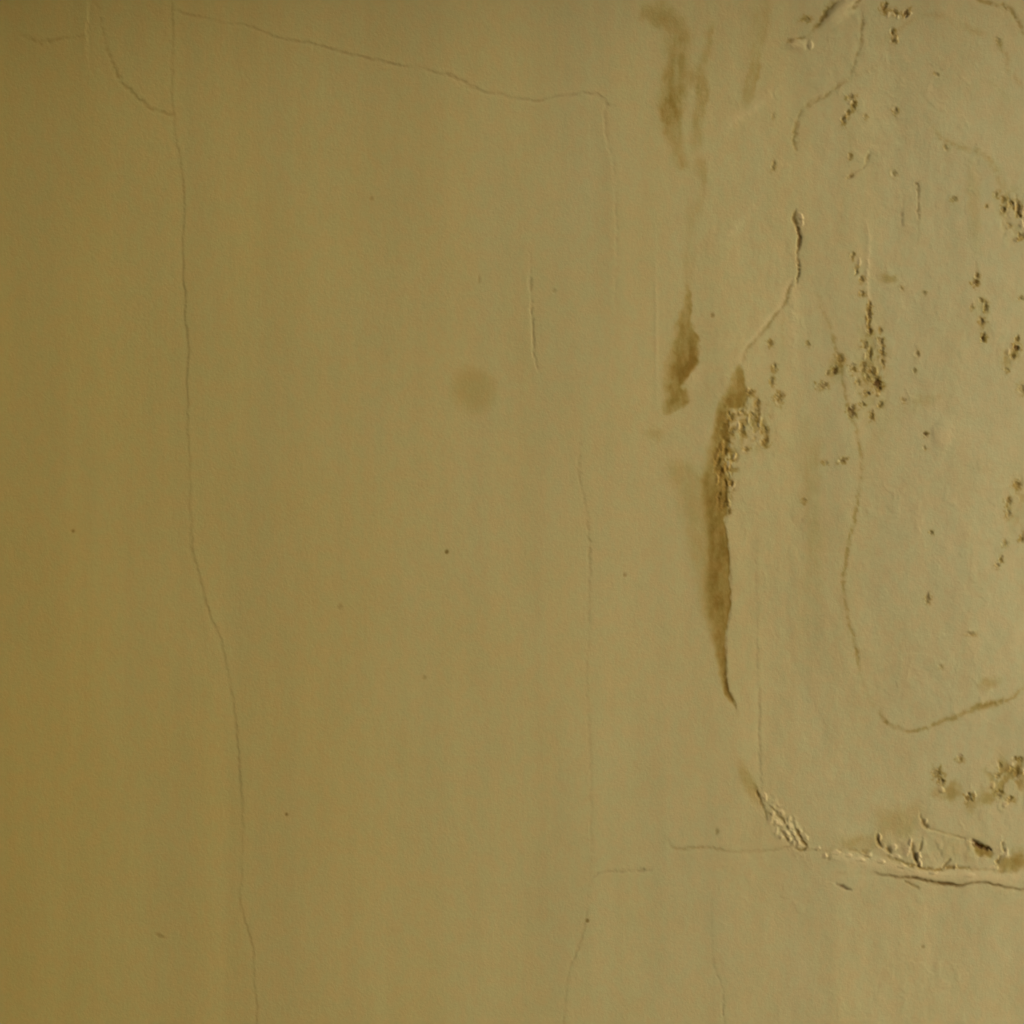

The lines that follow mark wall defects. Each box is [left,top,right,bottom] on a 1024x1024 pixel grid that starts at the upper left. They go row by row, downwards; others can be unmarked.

water stain [636,0,717,445]
crack [735,203,808,369]
spalling [811,91,909,446]
spalling [967,250,1024,399]
spalling [983,172,1024,255]
peeling [664,336,788,717]
crack [876,683,1024,735]
peeling [748,747,1024,878]